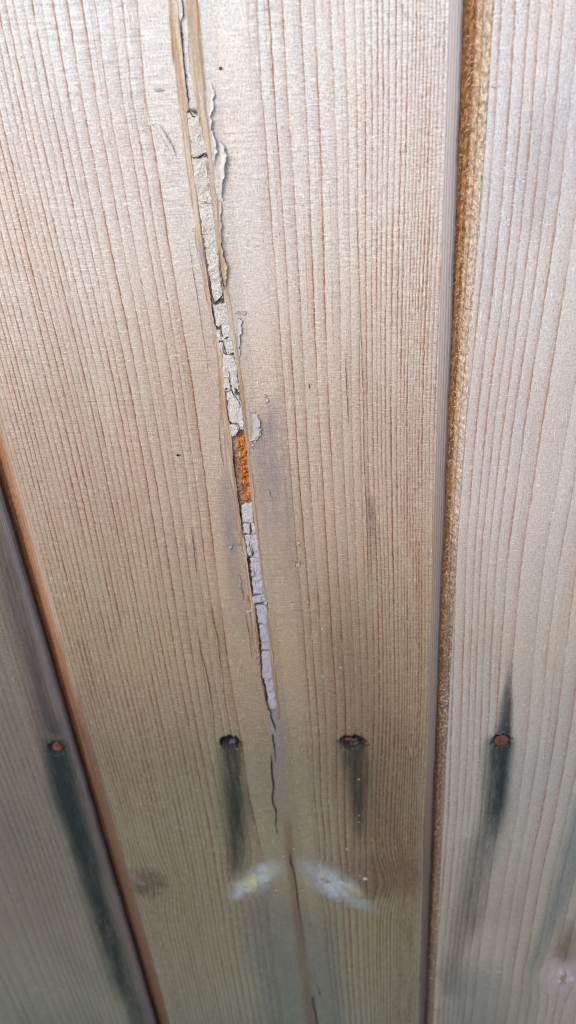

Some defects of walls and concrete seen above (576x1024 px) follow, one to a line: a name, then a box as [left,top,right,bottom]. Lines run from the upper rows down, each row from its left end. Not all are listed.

crack [169,0,306,959]
spalling [232,431,251,503]